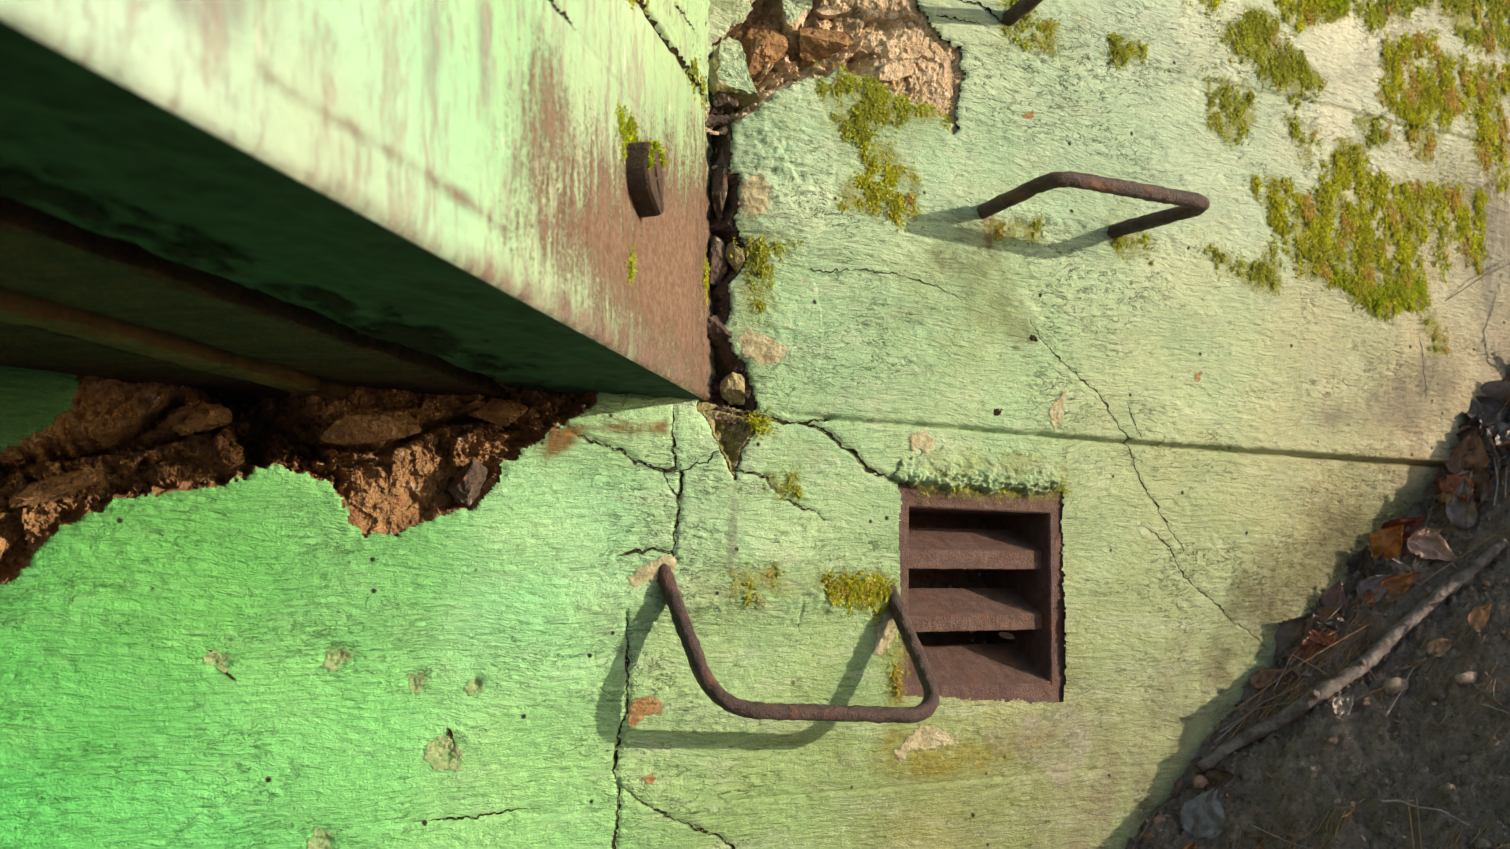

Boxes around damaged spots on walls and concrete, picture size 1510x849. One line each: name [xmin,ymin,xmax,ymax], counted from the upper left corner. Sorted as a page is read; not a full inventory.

rust [468,23,717,401]
spalling [696,0,965,480]
spalling [0,376,598,584]
crack [577,407,825,562]
crack [732,411,894,480]
crack [1030,320,1269,651]
crack [612,618,735,849]